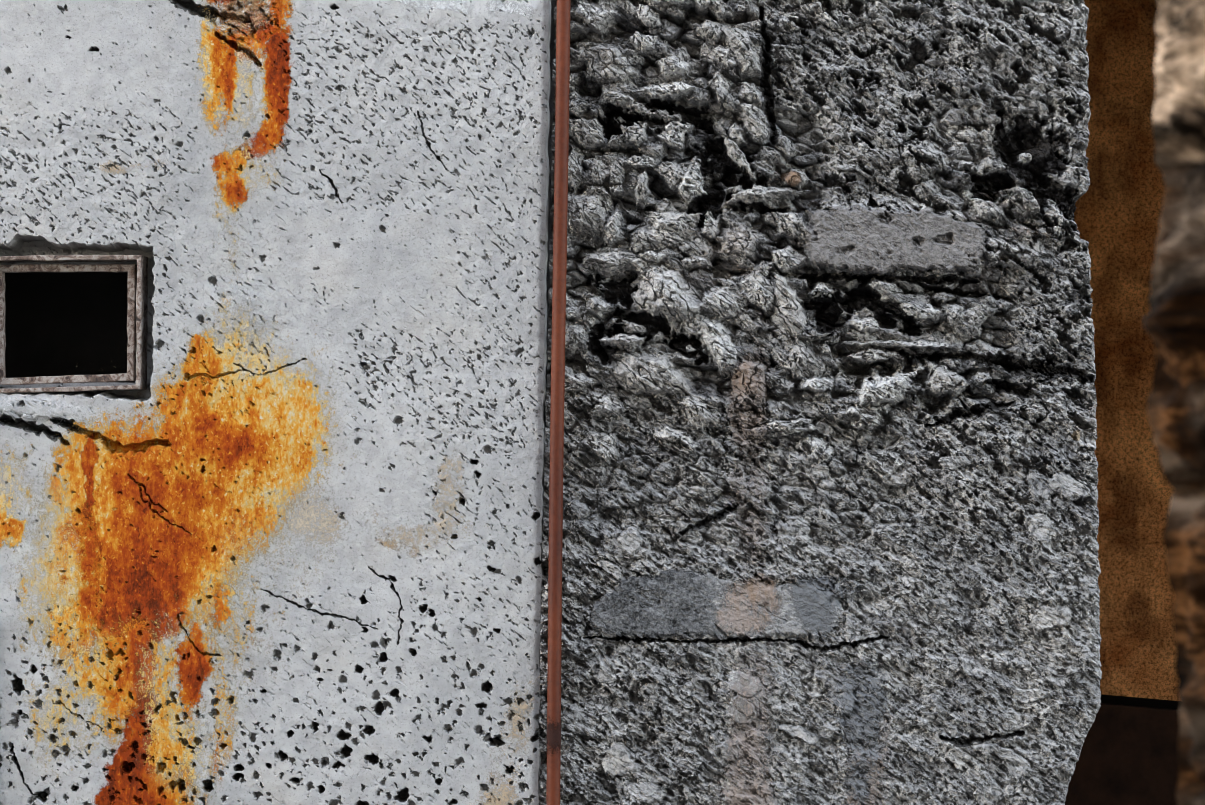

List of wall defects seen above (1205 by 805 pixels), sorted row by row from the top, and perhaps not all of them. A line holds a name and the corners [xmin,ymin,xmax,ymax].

crack [169,0,262,67]
crack [0,413,111,446]
corrosion [0,0,352,805]
crack [260,566,404,645]